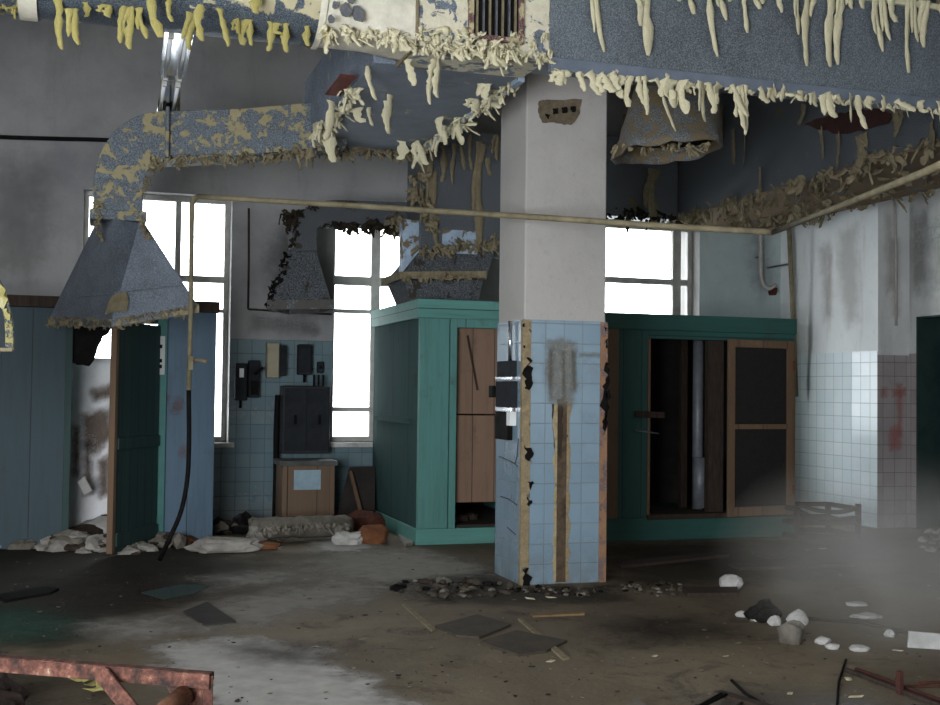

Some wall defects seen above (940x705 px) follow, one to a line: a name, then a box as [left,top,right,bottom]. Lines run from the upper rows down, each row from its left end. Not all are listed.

peeling [53,0,290,52]
peeling [590,0,606,52]
peeling [635,0,654,56]
peeling [677,0,940,73]
peeling [404,58,440,105]
peeling [323,99,337,162]
peeling [352,66,499,254]
spalling [538,69,940,173]
peeling [0,283,11,321]
peeling [522,345,533,390]
peeling [600,362,611,435]
peeling [552,399,572,583]